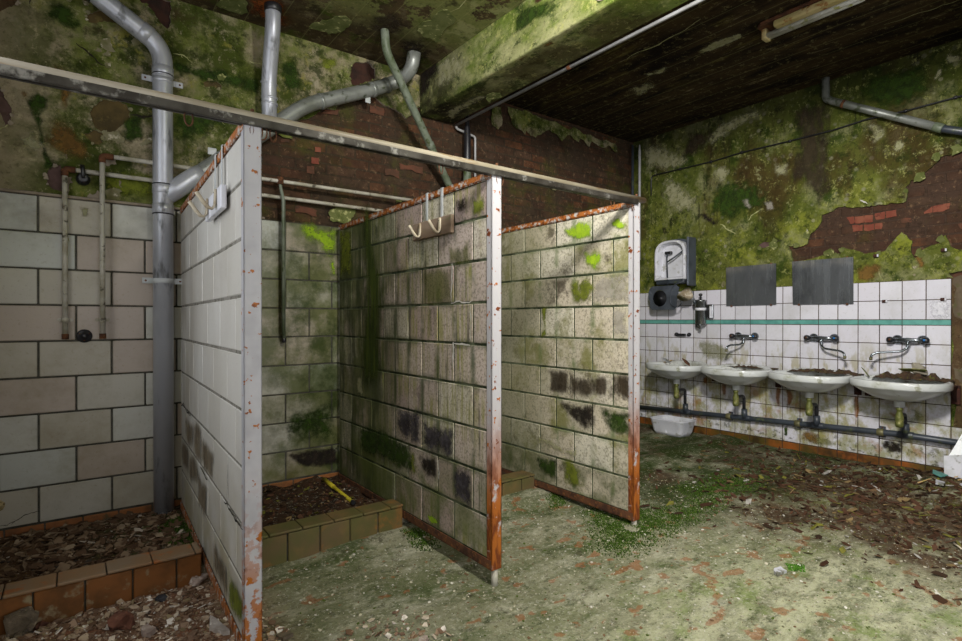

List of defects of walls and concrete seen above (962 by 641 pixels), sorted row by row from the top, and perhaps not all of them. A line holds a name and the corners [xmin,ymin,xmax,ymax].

spalling [66,0,124,29]
spalling [138,0,174,29]
water stain [373,14,404,33]
water stain [700,34,742,52]
water stain [402,41,437,96]
spalling [0,88,14,126]
spalling [88,99,133,143]
peeling [486,93,618,152]
spalling [757,144,962,428]
water stain [550,371,628,427]
water stain [398,411,453,479]
water stain [454,468,471,505]